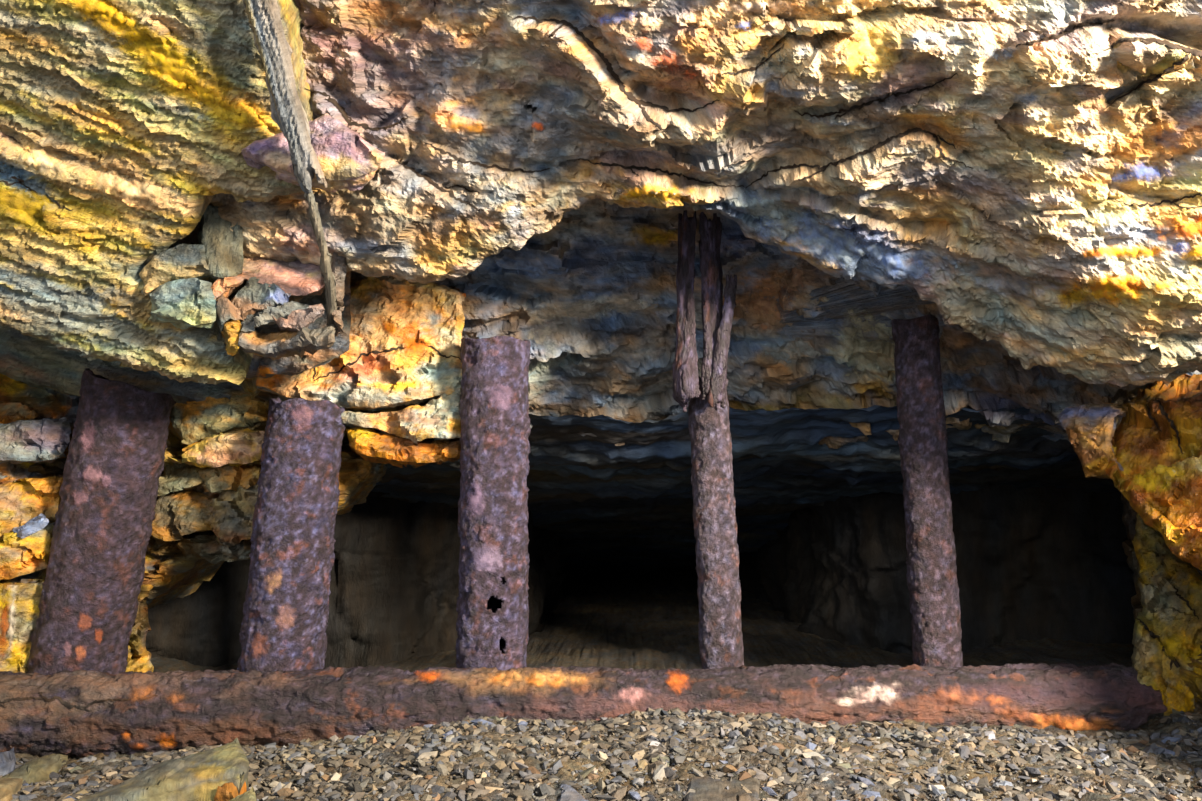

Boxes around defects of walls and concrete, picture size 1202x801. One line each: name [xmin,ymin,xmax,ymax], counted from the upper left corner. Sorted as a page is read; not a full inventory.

rust [490,384,512,410]
rust [81,423,94,451]
rust [74,466,111,504]
rust [468,484,484,513]
rust [474,545,501,571]
rust [268,572,282,593]
rust [276,606,294,628]
rust [64,642,86,660]
rust [493,672,585,686]
rust [669,674,686,688]
rust [621,688,642,702]
rust [938,688,1089,732]